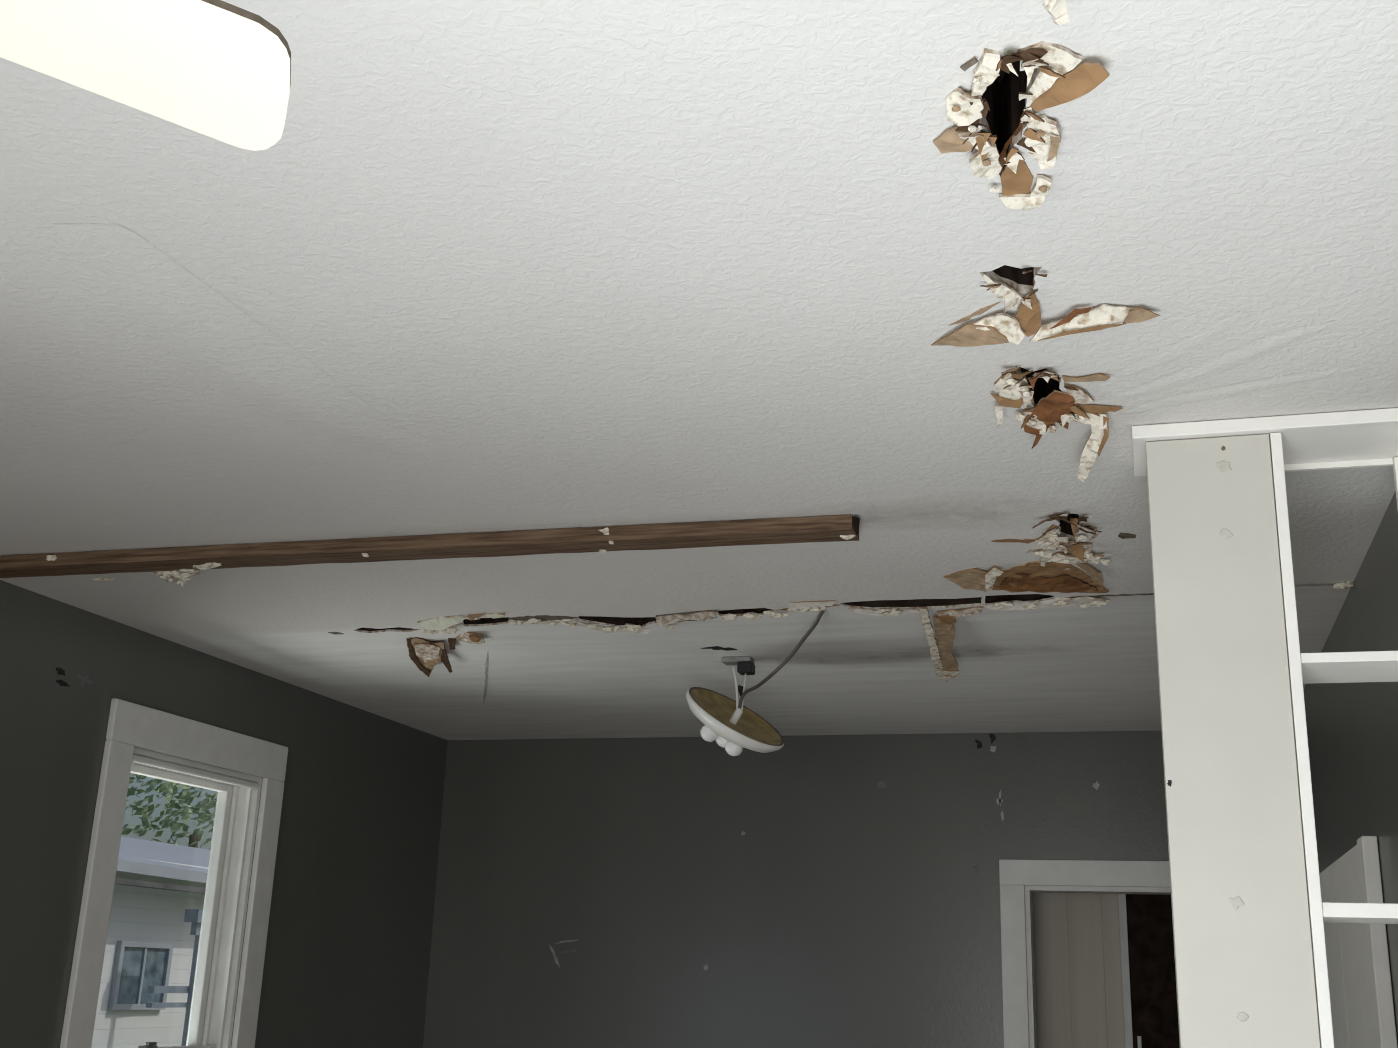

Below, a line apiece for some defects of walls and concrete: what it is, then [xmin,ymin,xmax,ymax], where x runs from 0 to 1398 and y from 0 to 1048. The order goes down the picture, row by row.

spalling [945,41,1083,210]
spalling [972,265,1042,345]
spalling [994,366,1100,435]
peeling [1035,514,1104,567]
peeling [985,567,1004,592]
crack [1294,581,1354,590]
crack [328,593,1154,702]